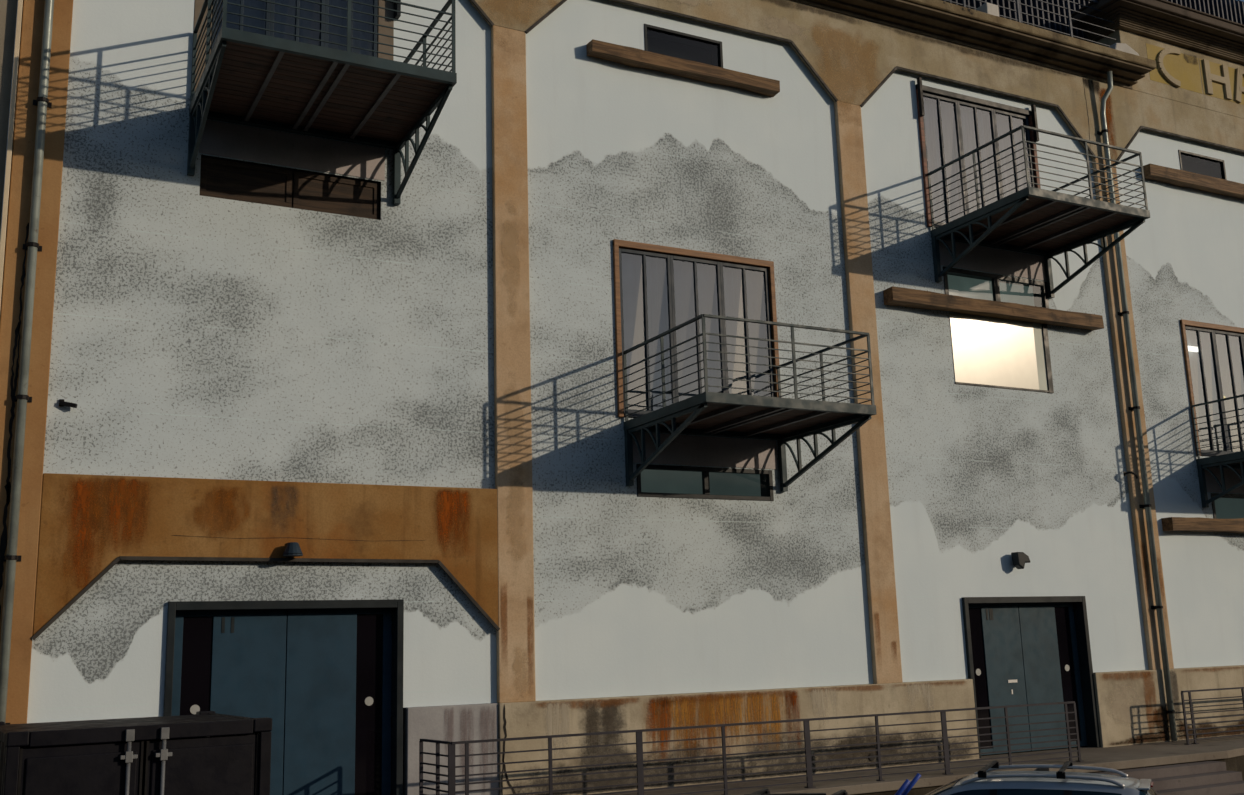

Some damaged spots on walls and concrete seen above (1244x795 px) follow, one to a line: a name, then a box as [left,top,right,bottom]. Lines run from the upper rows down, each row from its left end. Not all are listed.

crack [501,704,516,795]
corrosion [648,691,800,756]